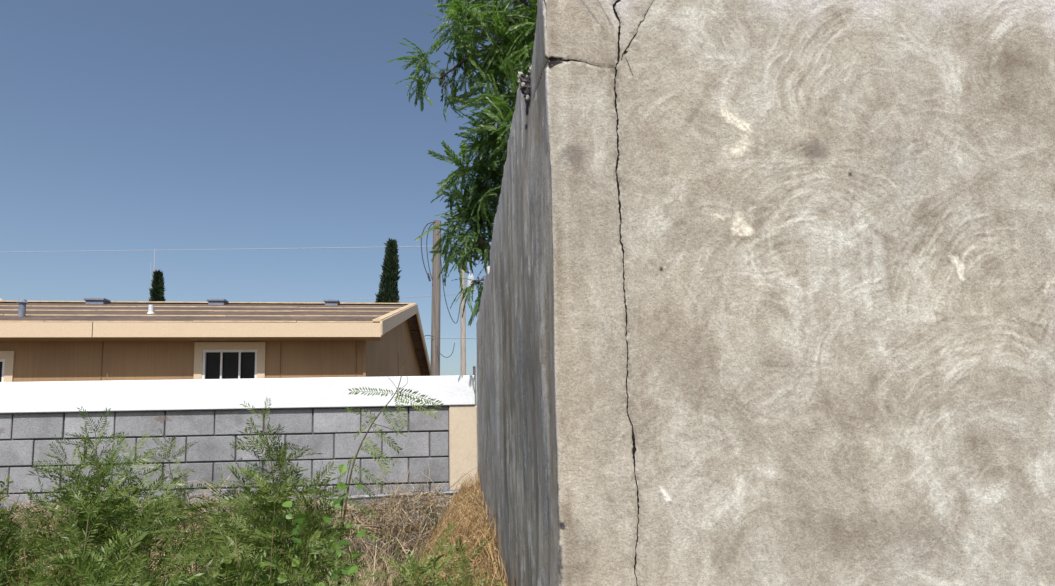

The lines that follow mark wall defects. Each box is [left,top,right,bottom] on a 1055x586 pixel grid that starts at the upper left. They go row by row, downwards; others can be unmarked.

crack [536,0,653,586]